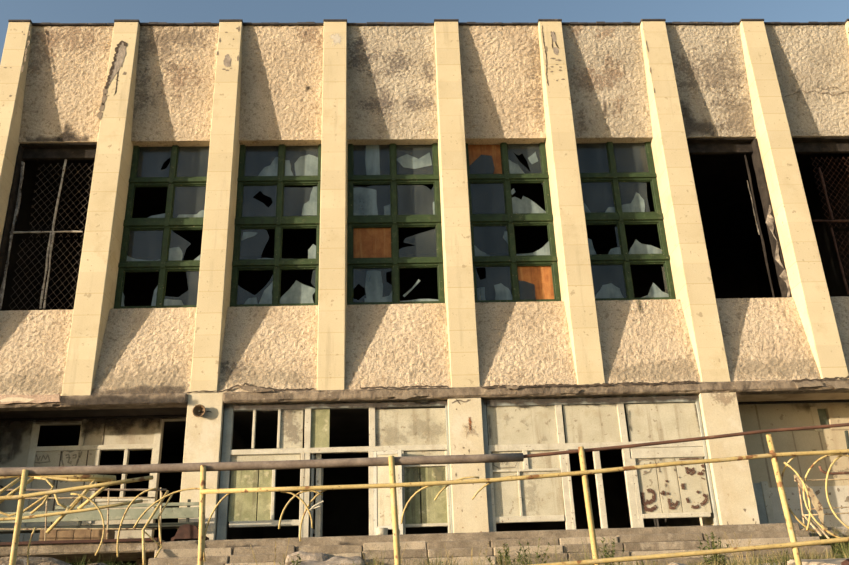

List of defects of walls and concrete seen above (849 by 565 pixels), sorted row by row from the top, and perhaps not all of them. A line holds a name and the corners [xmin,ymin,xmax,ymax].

spalling [97,41,127,120]
damp [348,37,412,115]
damp [407,62,436,110]
spalling [550,31,565,81]
crack [785,80,849,101]
spalling [792,376,849,389]